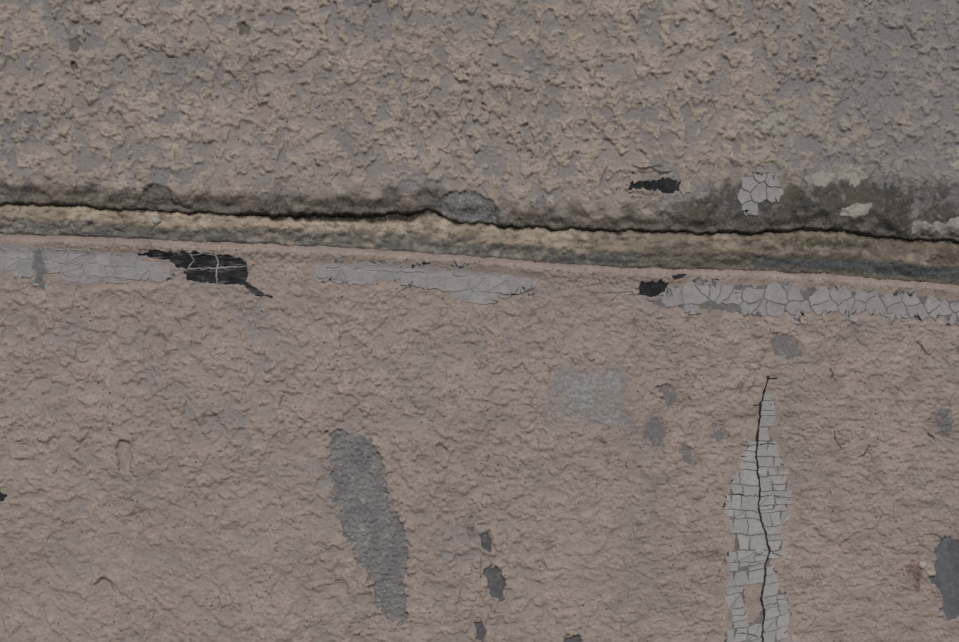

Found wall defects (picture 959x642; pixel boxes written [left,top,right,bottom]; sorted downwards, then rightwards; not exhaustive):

peeling [628,177,692,198]
peeling [736,170,784,217]
leakage [668,180,959,230]
flaking render [840,202,873,219]
peeling [0,243,273,298]
peeling [314,257,540,316]
peeling [632,274,959,334]
leakage [754,256,959,281]
peeling [326,429,410,626]
crack [732,376,784,642]
peeling [720,394,799,642]
peeling [926,536,959,621]